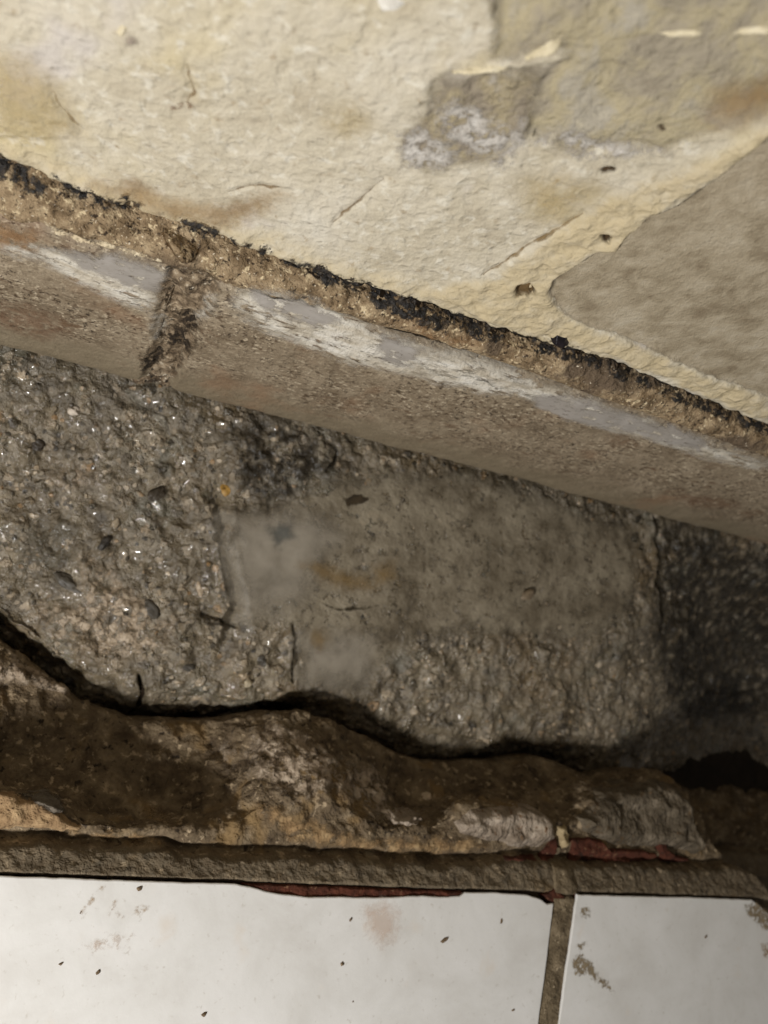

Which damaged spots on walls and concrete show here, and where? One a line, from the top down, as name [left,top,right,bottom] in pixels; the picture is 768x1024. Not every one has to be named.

peeling [550,138,768,396]
crack [290,625,298,677]
spalling [0,659,69,693]
crack [128,678,145,714]
crack [176,709,229,717]
crack [254,700,301,710]
spalling [215,726,394,818]